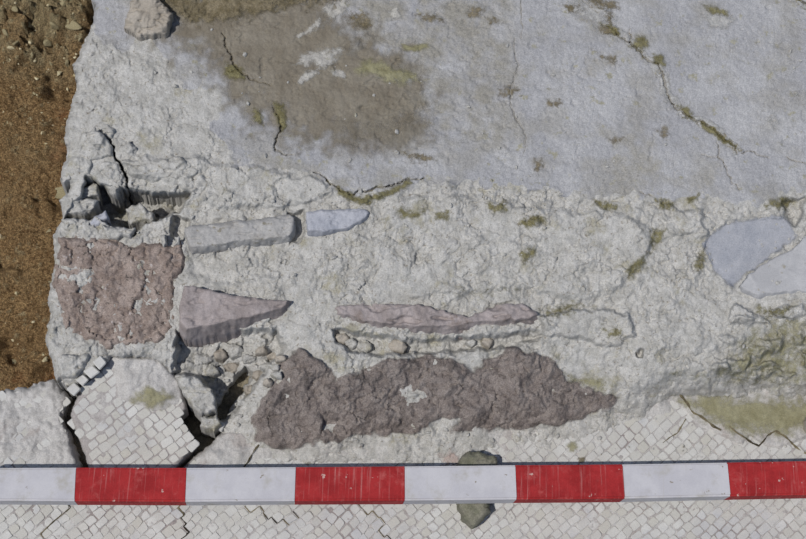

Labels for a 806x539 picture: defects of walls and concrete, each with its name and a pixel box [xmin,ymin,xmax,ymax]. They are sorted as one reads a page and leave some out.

crack [790,0,806,9]
crack [224,46,264,83]
water stain [162,0,426,151]
crack [253,102,287,156]
crack [598,21,754,191]
crack [327,179,421,205]
spalling [132,387,171,408]
spalling [251,346,617,450]